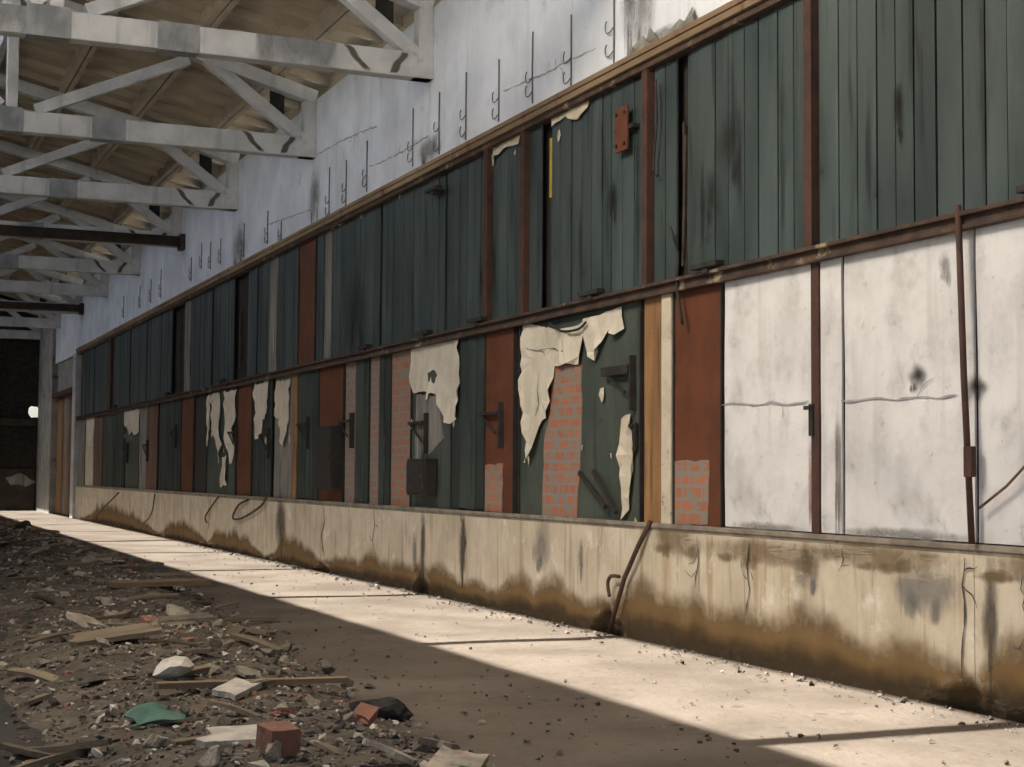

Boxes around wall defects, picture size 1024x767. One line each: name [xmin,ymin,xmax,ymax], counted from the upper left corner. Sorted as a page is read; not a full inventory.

leakage [625,0,666,49]
peeling [206,389,237,487]
peeling [253,379,291,447]
peeling [409,339,460,427]
peeling [518,306,624,518]
peeling [610,414,637,522]
crack [721,400,809,418]
crack [841,378,957,403]
leakage [910,368,923,391]
leakage [80,501,1024,723]